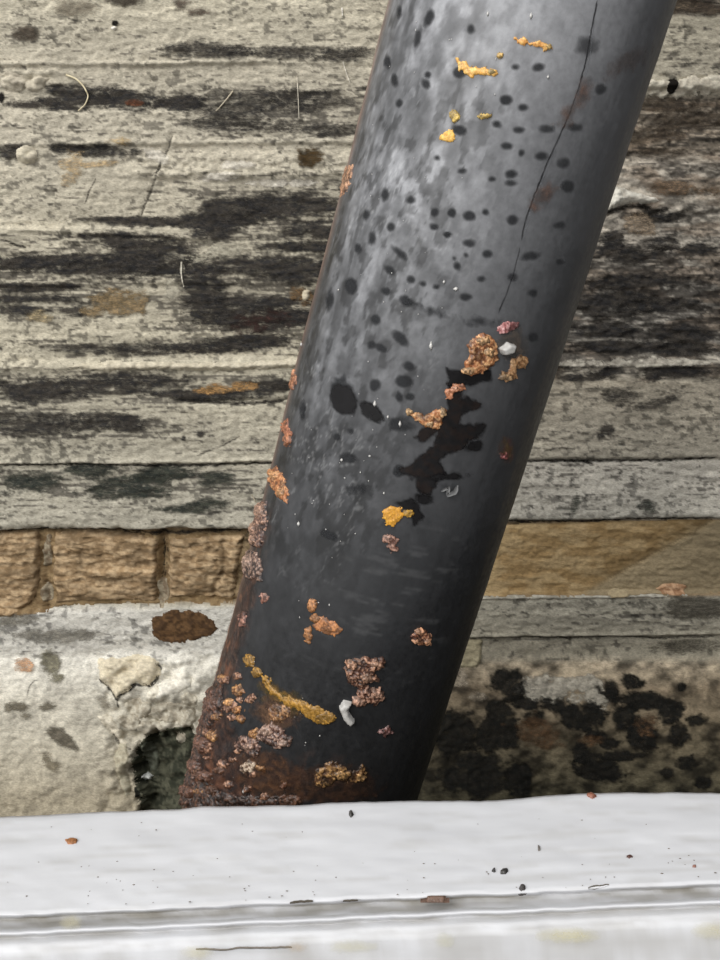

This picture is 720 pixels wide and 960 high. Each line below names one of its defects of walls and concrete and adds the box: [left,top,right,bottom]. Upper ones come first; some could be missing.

crack [519,2,597,249]
water stain [0,160,338,356]
water stain [0,371,289,438]
corrosion [406,321,529,429]
water stain [446,368,491,389]
corrosion [241,466,289,604]
corrosion [382,506,414,553]
water stain [397,494,433,526]
spalling [97,673,198,810]
corrosion [178,654,376,807]
corrosion [343,656,386,707]
water stain [435,667,712,801]